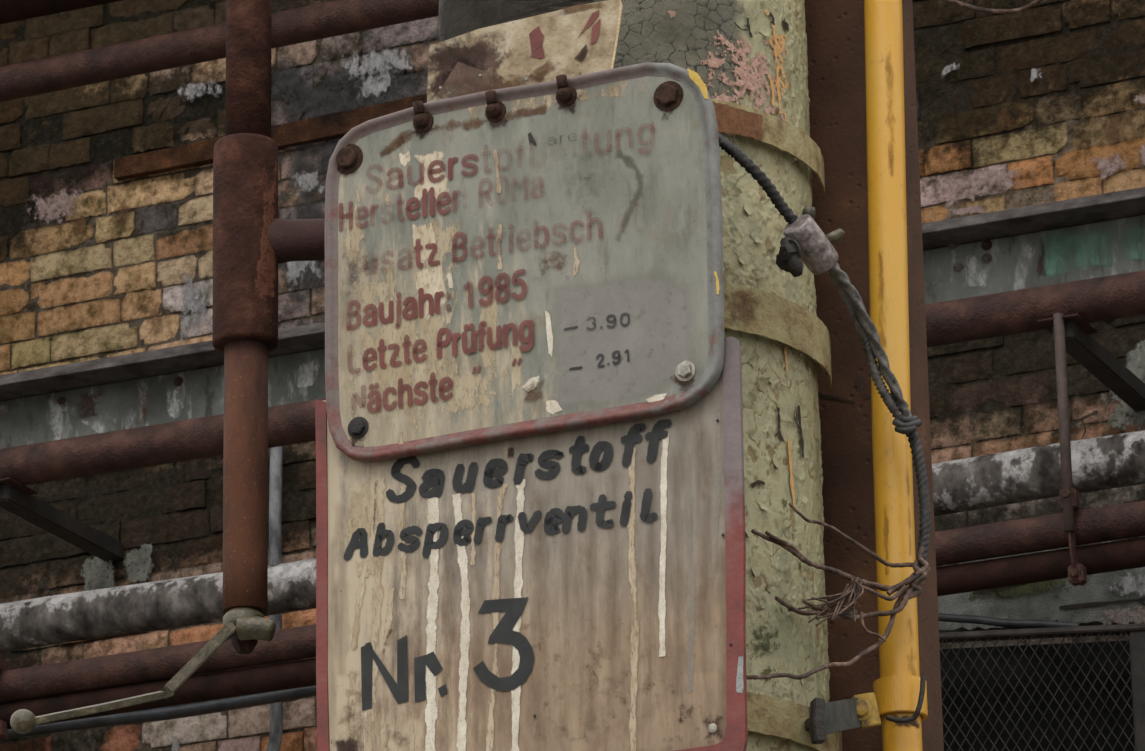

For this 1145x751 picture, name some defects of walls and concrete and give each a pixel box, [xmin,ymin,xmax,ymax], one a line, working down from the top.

efflorescence [342,49,412,98]
peeling [700,10,789,121]
peeling [773,435,808,508]
spalling [746,566,794,694]